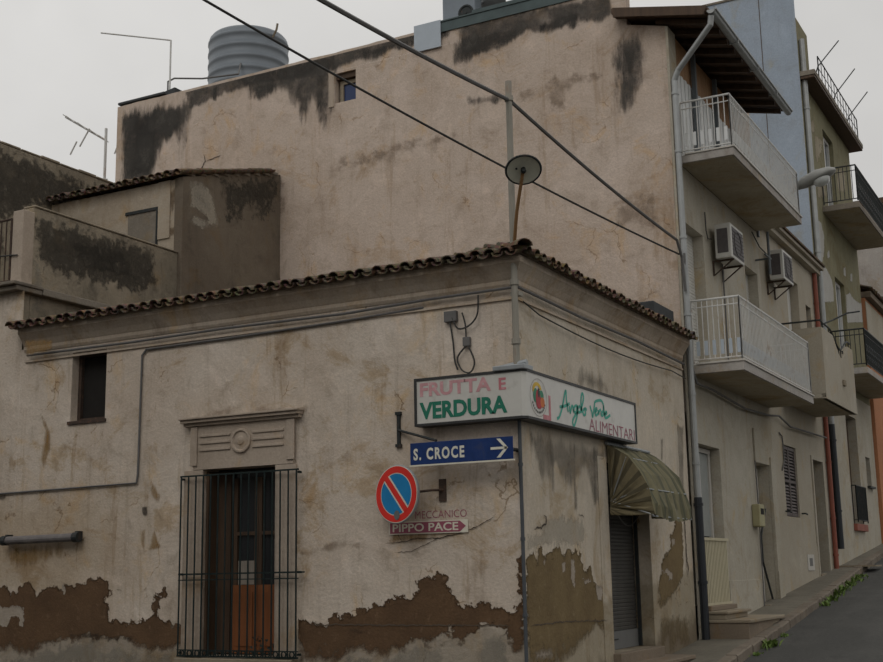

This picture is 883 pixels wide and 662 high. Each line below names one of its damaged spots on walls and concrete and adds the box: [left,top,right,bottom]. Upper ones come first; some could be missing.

leakage [454,0,611,62]
leakage [123,35,414,179]
leakage [615,38,641,110]
leakage [0,150,96,220]
leakage [220,174,277,223]
leakage [34,219,155,293]
flaking render [658,520,684,607]
flaking render [0,576,181,653]
flaking render [298,546,604,662]